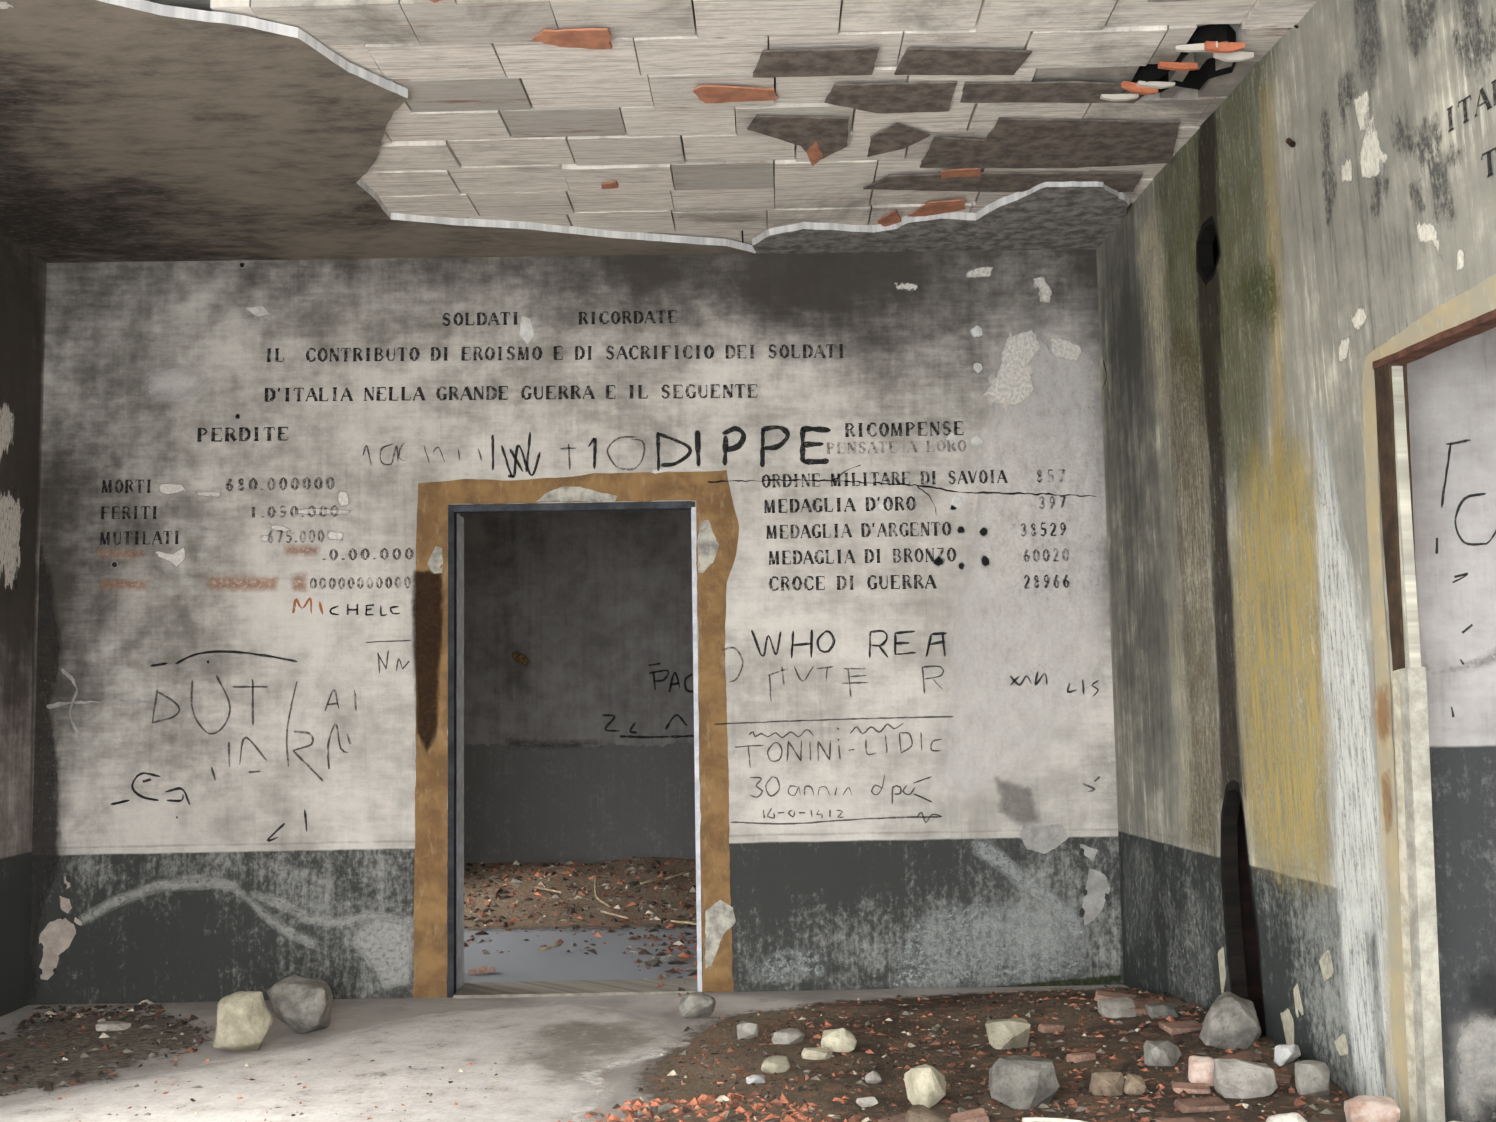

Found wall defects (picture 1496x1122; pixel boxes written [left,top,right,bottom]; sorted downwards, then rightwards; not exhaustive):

peeling [532,28,612,49]
peeling [693,85,777,103]
peeling [1322,0,1460,253]
peeling [877,199,965,227]
peeling [966,266,993,278]
peeling [1033,276,1052,303]
peeling [1456,247,1466,271]
peeling [1338,307,1367,362]
peeling [973,329,1081,411]
peeling [0,403,15,462]
peeling [0,486,24,590]
peeling [36,875,83,980]